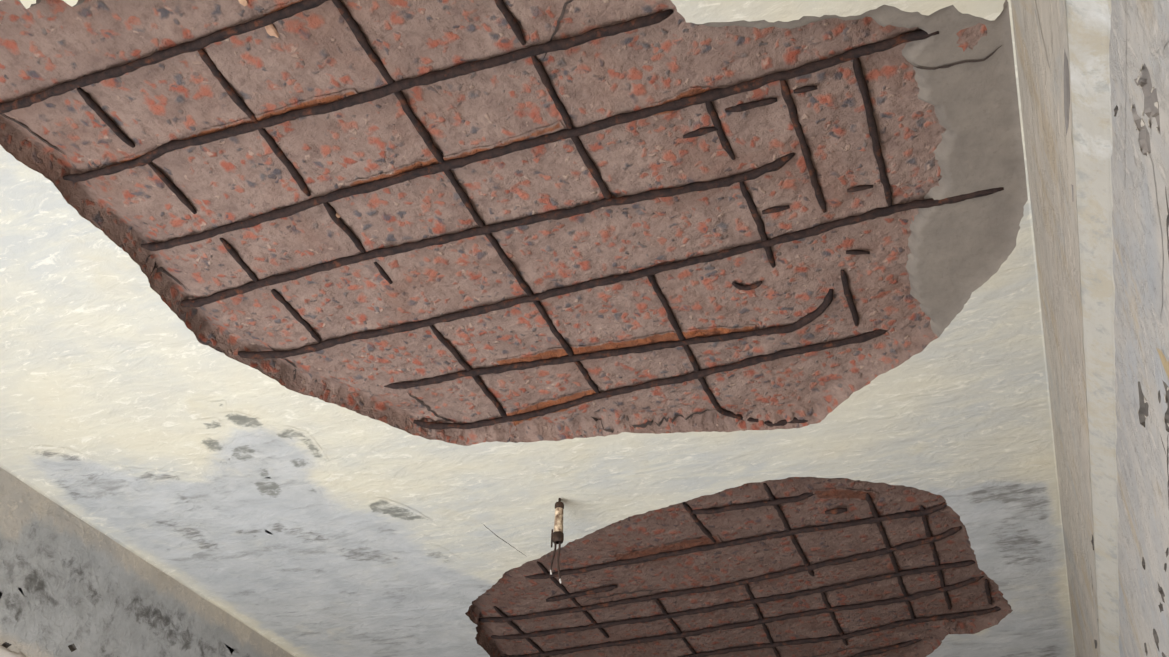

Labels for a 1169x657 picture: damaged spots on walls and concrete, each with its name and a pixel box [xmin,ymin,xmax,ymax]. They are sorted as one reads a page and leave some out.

peeling [1114,63,1161,156]
spalling [0,0,1028,446]
crack [1160,435,1169,505]
water stain [0,400,499,657]
spalling [465,477,1013,657]
peeling [1157,548,1169,612]
peeling [1144,629,1166,657]